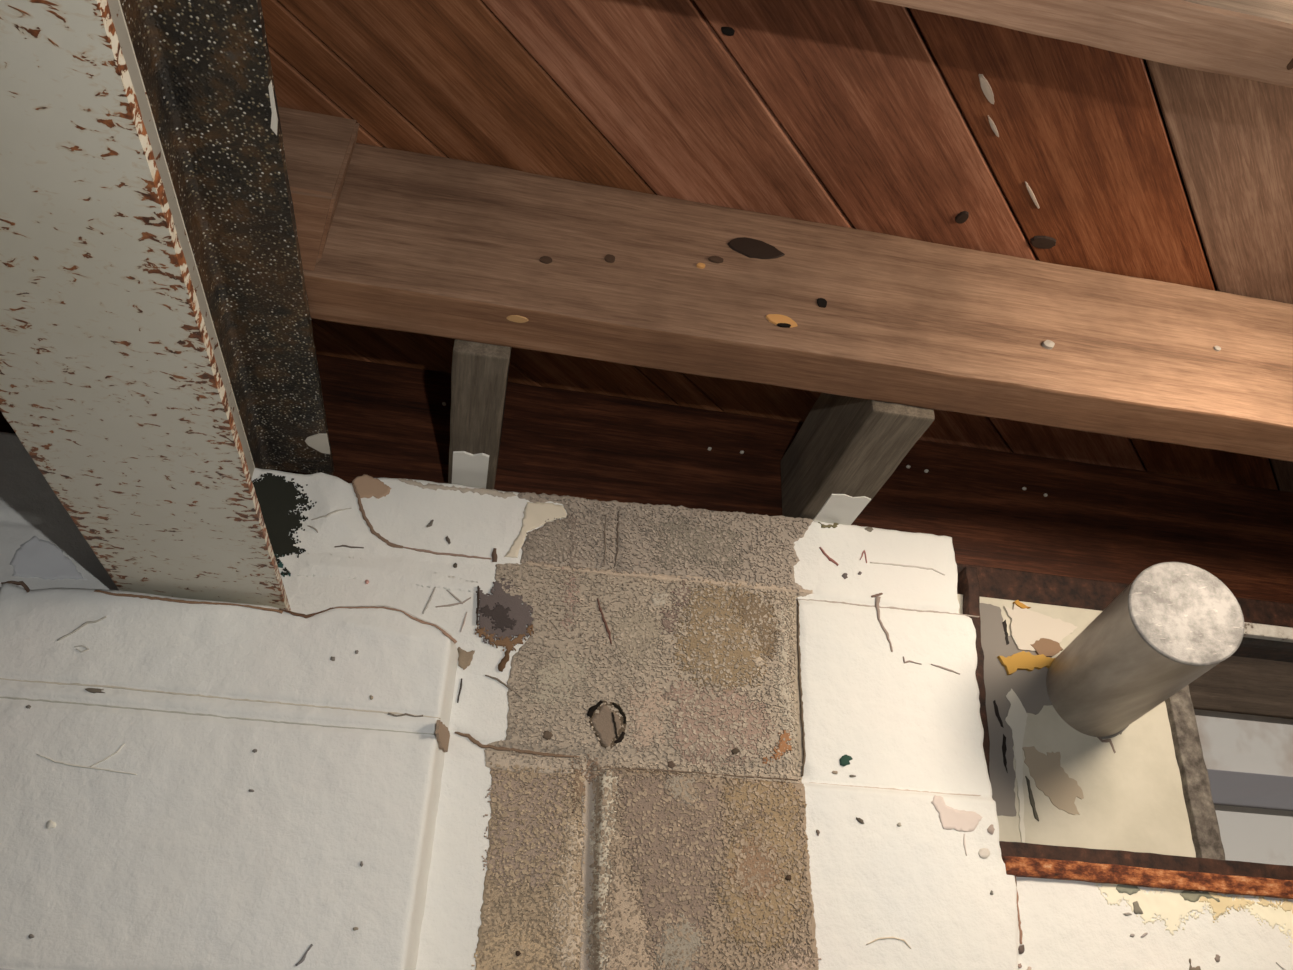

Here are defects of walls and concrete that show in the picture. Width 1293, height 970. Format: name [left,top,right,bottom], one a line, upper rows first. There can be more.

peeling [352,474,839,970]
damp [471,513,822,970]
peeling [1116,884,1143,916]
peeling [1180,890,1220,902]